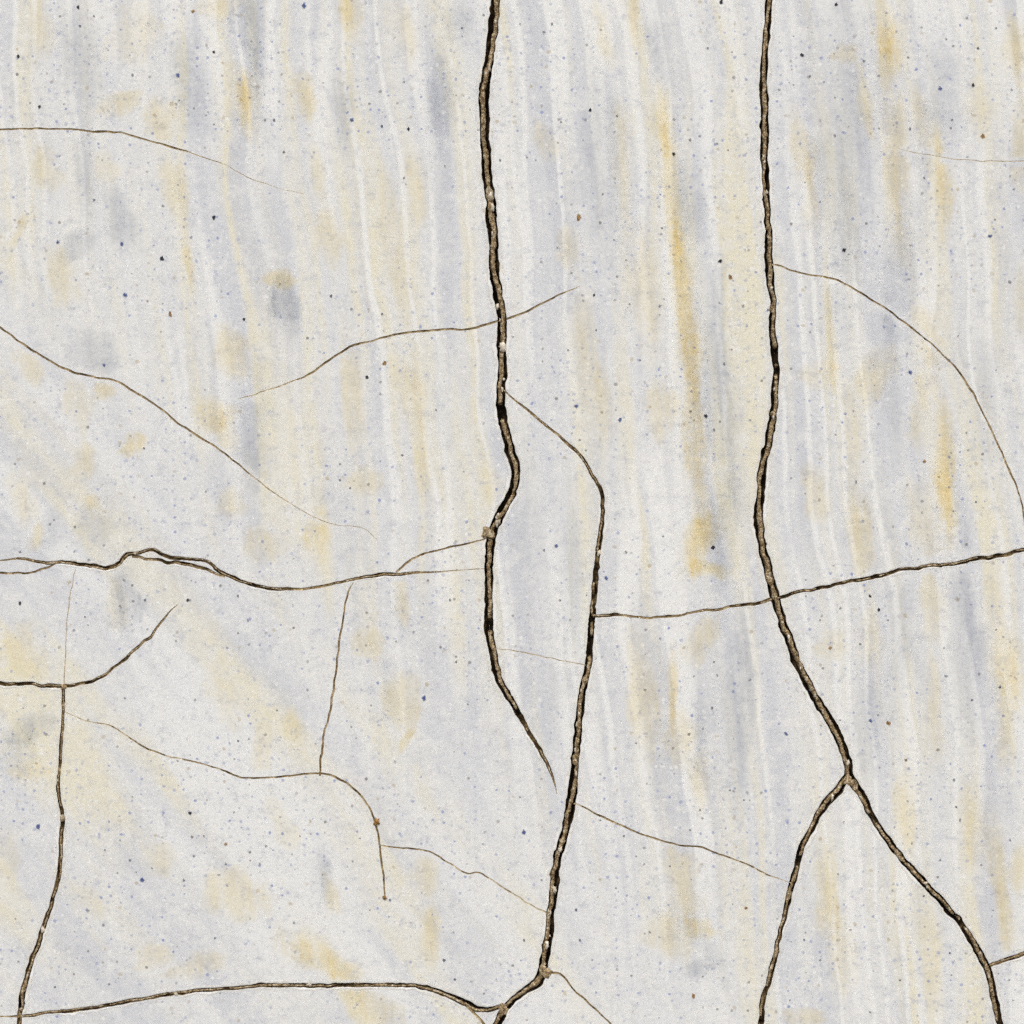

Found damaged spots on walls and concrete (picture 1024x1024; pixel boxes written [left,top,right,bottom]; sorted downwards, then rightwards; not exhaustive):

crack [0,0,784,1024]
crack [593,0,1024,1024]